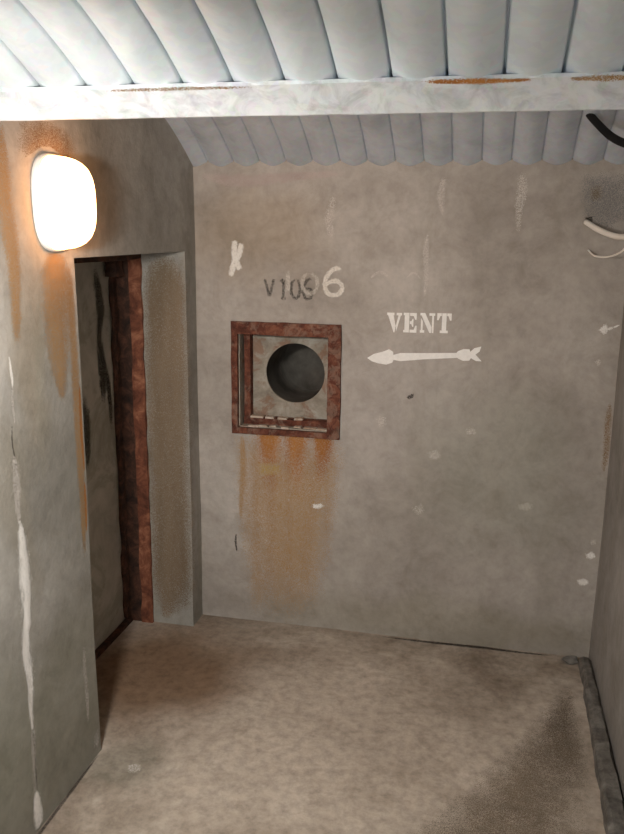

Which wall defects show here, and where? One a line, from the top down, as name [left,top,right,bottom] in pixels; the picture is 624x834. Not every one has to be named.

rust [0,123,22,341]
rust [17,120,76,158]
rust [570,74,624,82]
rust [40,251,87,557]
rust [231,414,348,622]
water stain [12,456,43,830]